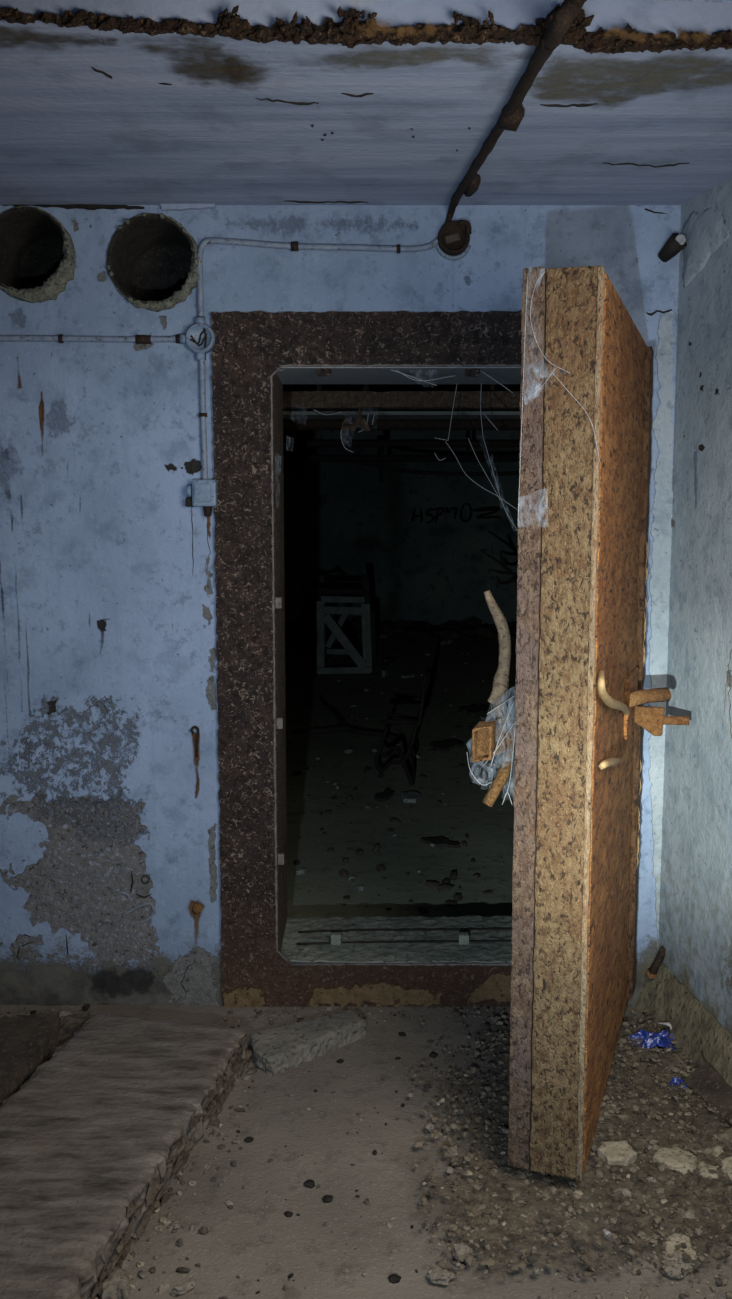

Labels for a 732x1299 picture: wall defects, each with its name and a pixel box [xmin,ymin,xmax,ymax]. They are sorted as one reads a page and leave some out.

corrosion [0,5,560,49]
corrosion [558,8,732,54]
water stain [145,40,265,85]
water stain [536,57,732,106]
peeling [202,557,213,625]
peeling [206,648,216,710]
corrosion [192,733,200,798]
spalling [0,691,160,967]
peeling [207,823,218,902]
corrosion [189,900,204,943]
water stain [92,969,153,998]
spalling [163,946,220,1006]